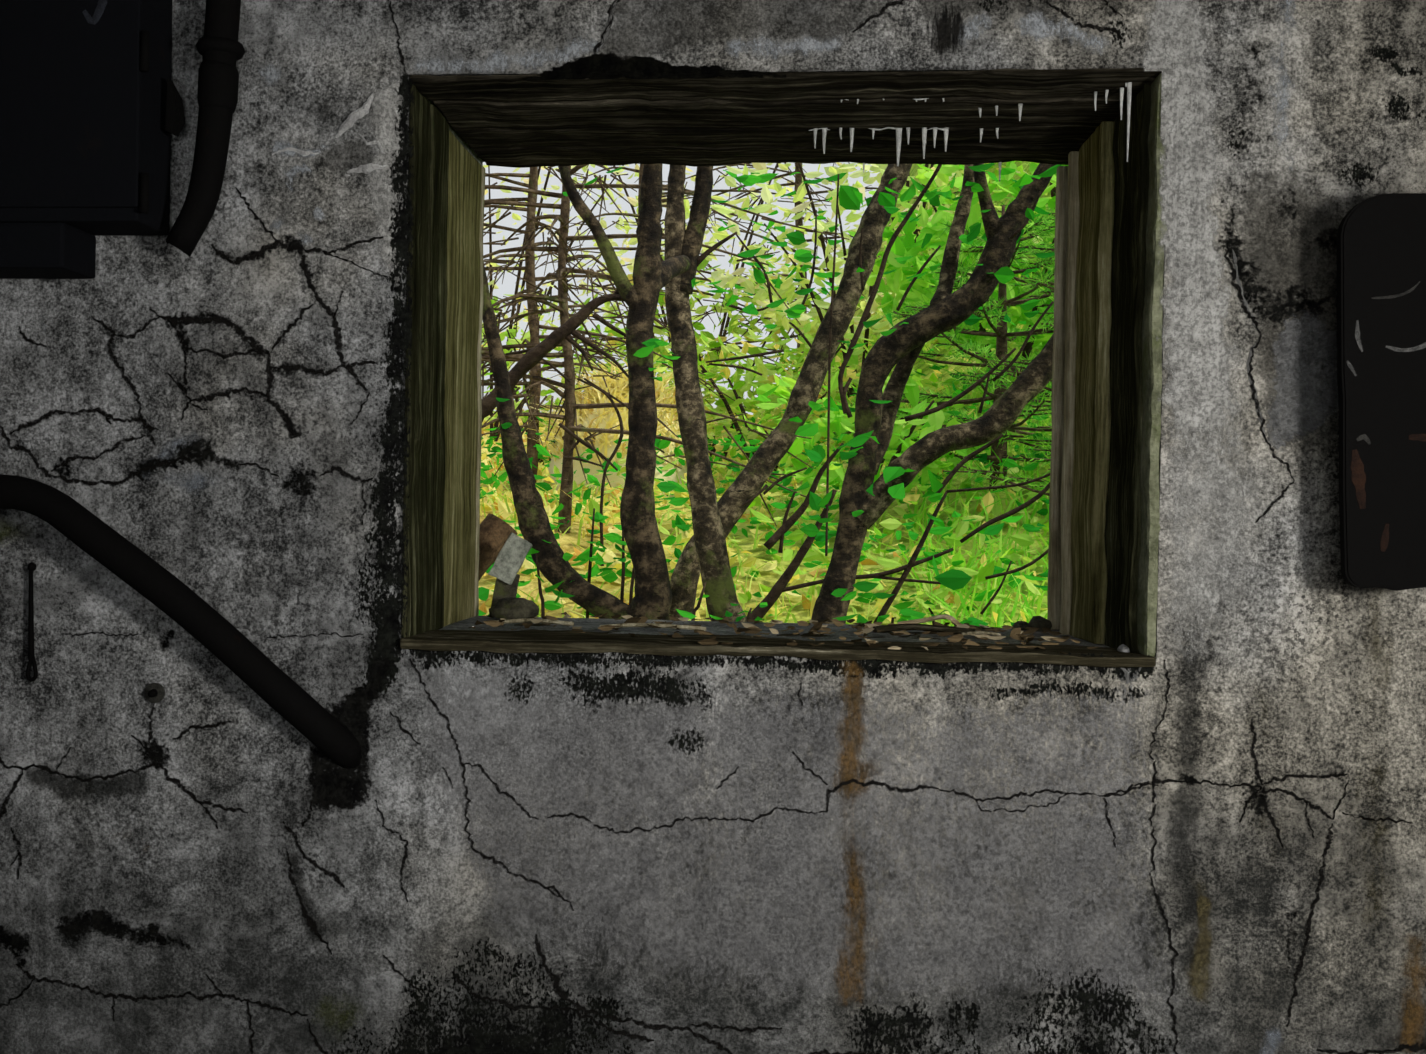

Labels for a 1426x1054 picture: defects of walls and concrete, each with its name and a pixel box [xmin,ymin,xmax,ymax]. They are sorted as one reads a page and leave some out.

water stain [921,0,1133,57]
crack [1046,0,1123,40]
crack [0,187,388,487]
water stain [306,38,1157,813]
crack [1224,246,1295,523]
crack [0,703,248,880]
crack [283,802,345,955]
rust [841,662,872,794]
crack [390,658,1426,1054]
water stain [1159,649,1211,999]
mould [326,938,641,1054]
mould [844,965,1172,1054]